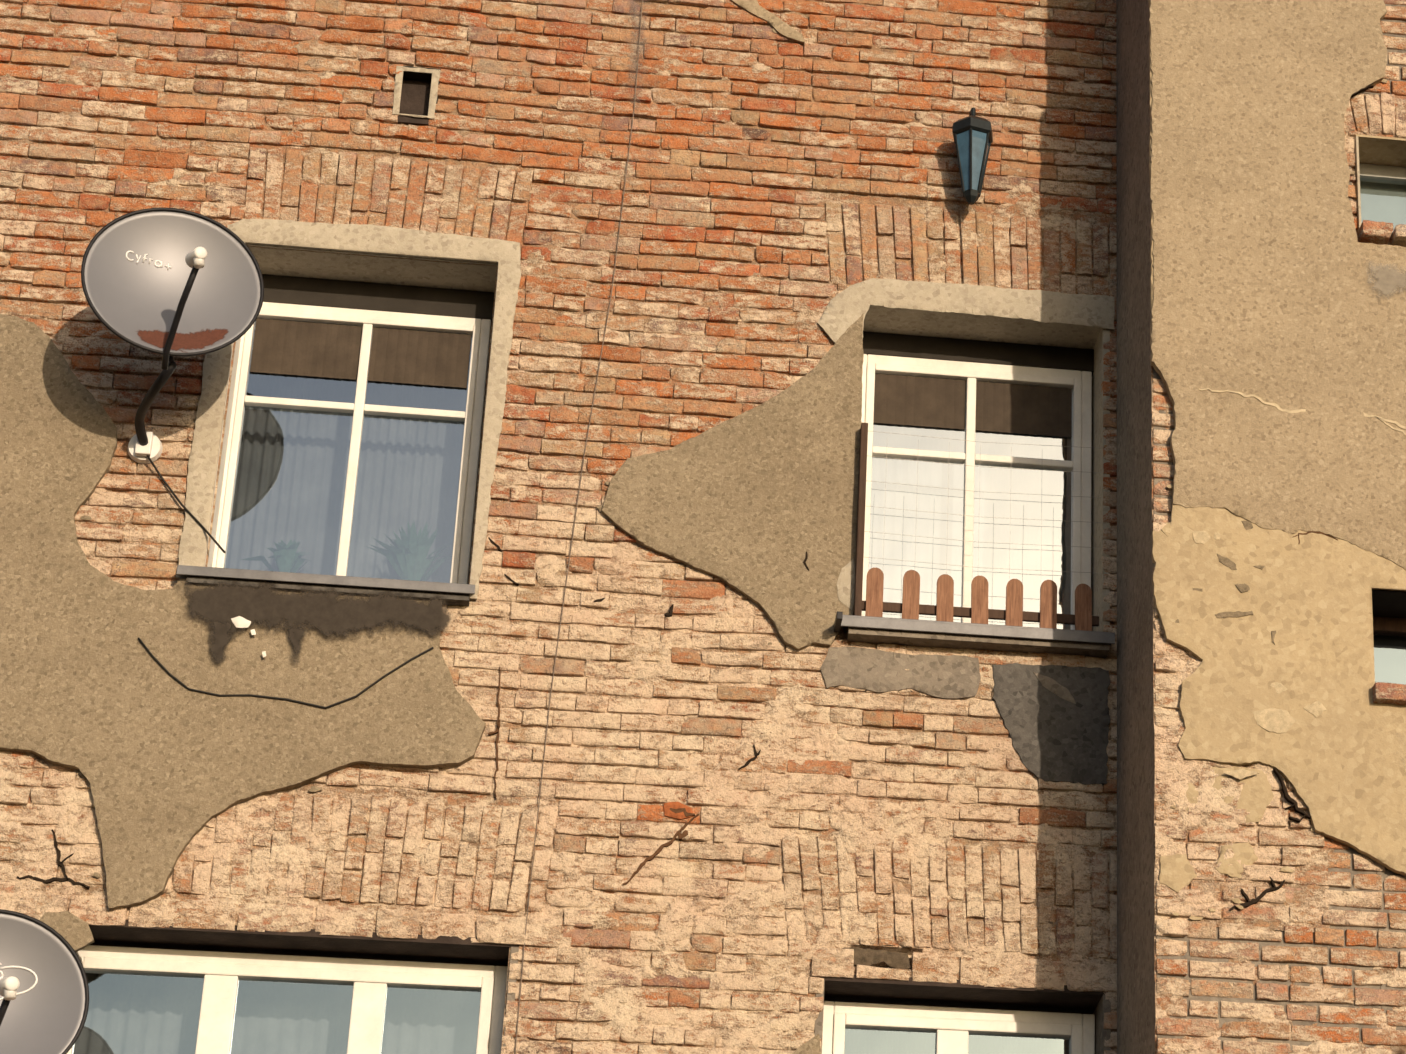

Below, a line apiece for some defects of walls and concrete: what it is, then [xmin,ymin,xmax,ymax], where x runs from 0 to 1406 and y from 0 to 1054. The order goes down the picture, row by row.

flaking render [1344,0,1406,242]
crack [1199,388,1307,413]
crack [1363,412,1406,436]
peeling [595,314,864,651]
flaking render [1193,531,1250,593]
peeling [0,314,485,910]
crack [623,808,699,885]
spalling [664,802,694,820]
flaking render [1152,563,1406,1054]
peeling [40,911,94,952]